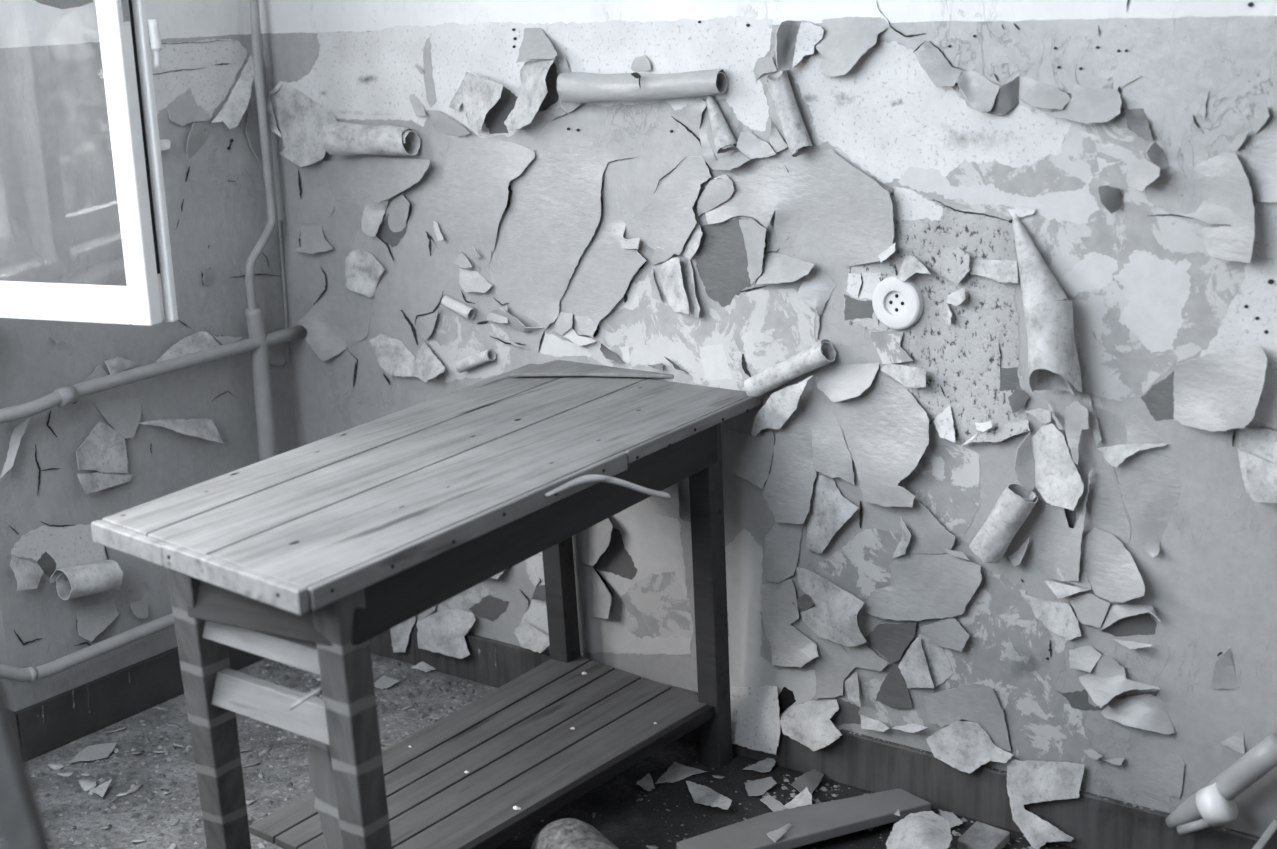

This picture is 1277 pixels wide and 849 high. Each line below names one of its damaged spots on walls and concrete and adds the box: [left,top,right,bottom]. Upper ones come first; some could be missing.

peeling [150,38,261,160]
crack [10,410,72,535]
peeling [76,398,224,494]
peeling [266,16,1277,849]
peeling [10,524,149,646]